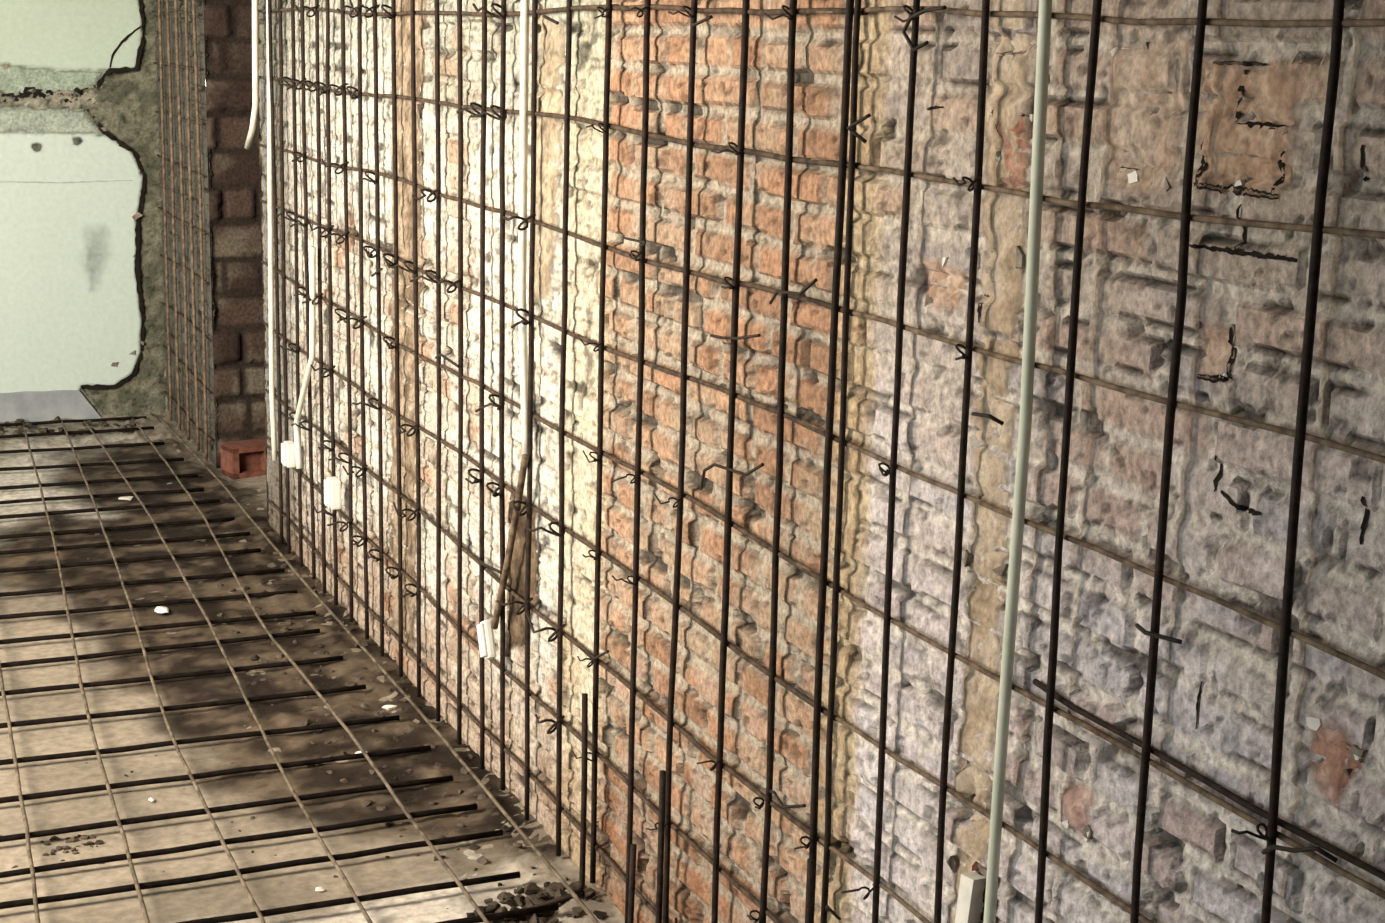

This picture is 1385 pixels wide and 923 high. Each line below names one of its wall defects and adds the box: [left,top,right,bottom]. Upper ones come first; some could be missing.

spalling [0,0,1039,923]
spalling [1002,0,1385,923]